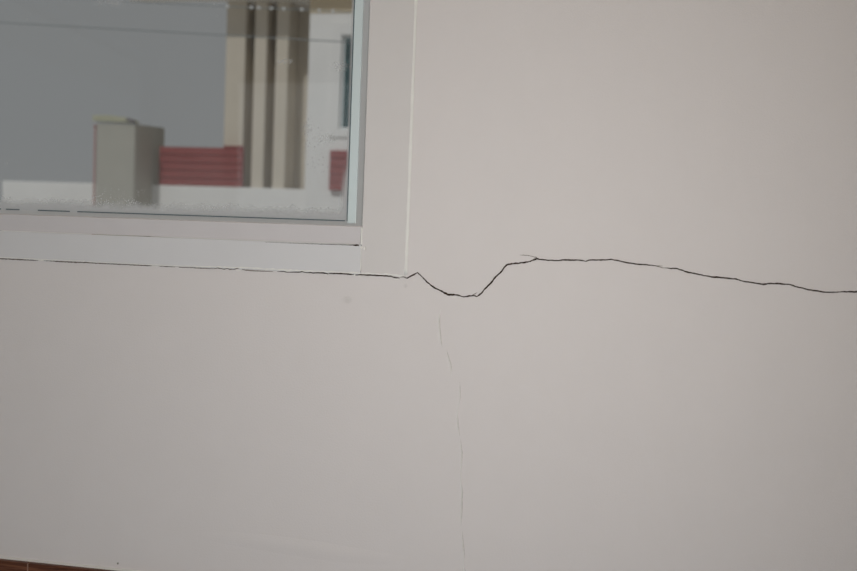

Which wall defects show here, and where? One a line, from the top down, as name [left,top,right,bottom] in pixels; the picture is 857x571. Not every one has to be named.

crack [0,255,857,571]